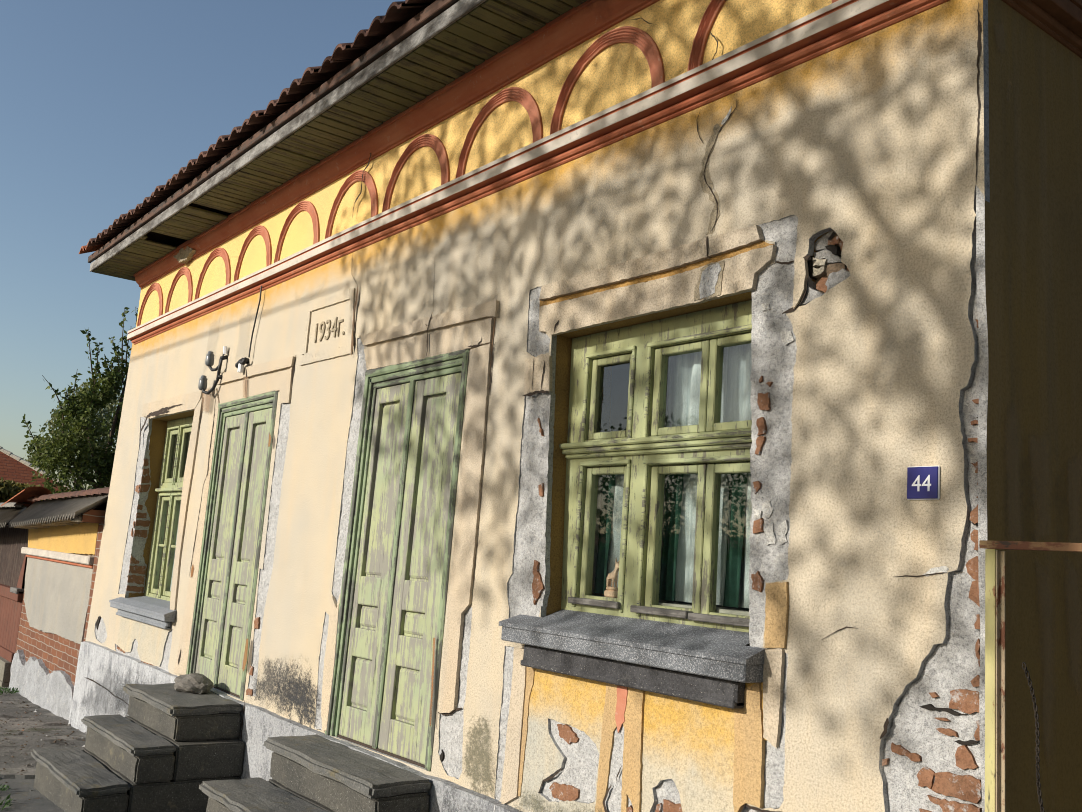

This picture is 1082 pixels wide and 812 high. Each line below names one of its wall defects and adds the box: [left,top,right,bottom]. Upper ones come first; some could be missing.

crack [697,102,737,255]
flaking render [119,417,152,594]
flaking render [508,393,555,618]
flaking render [749,215,850,648]
flaking render [882,236,982,812]
leakage [248,658,320,728]
flaking render [542,686,633,812]
flaking render [653,779,682,812]
flaking render [743,653,788,812]